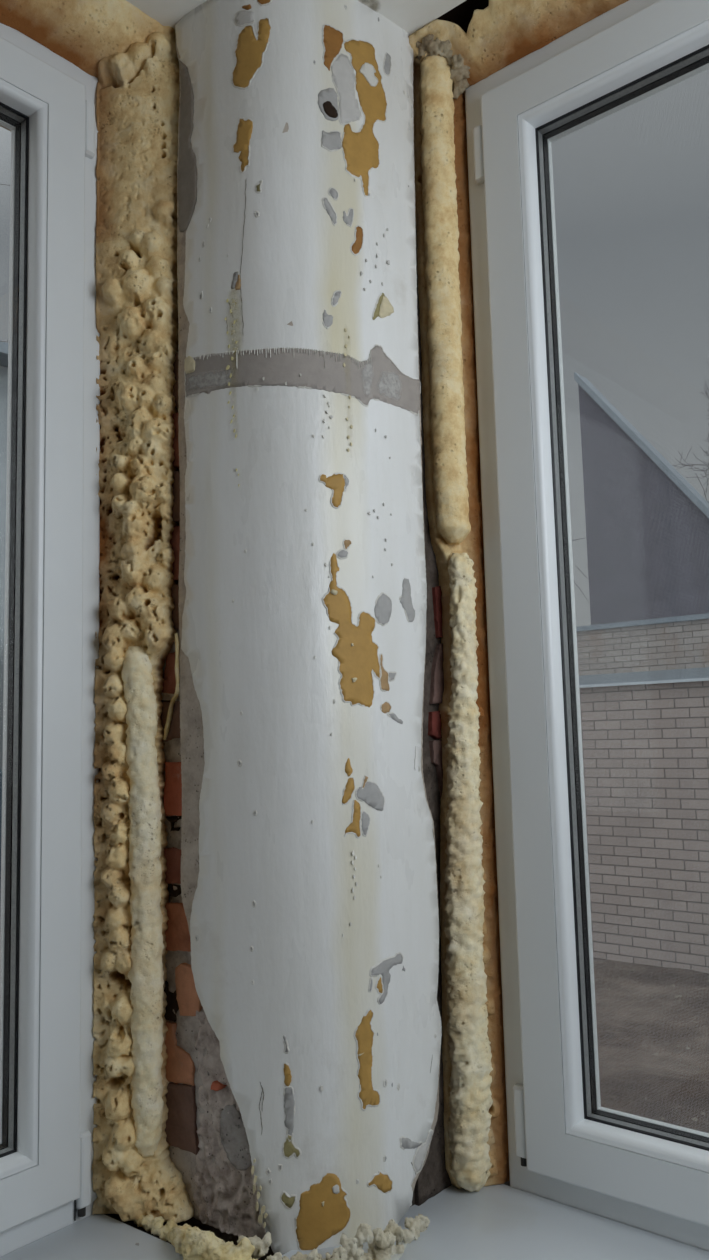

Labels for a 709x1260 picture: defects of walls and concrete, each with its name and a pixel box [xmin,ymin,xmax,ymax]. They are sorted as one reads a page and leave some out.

peeling [232,118,253,173]
peeling [231,0,272,90]
peeling [313,24,392,197]
peeling [322,187,394,320]
spalling [160,271,451,1251]